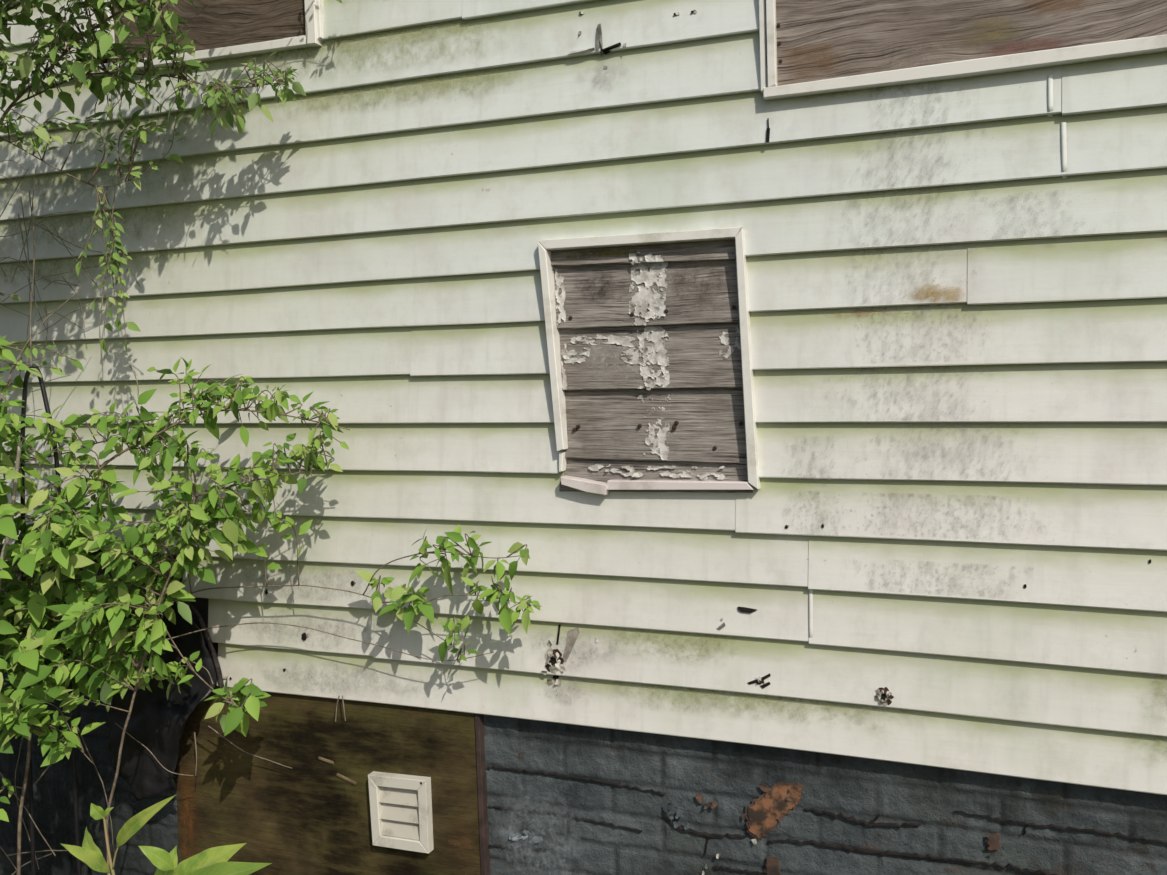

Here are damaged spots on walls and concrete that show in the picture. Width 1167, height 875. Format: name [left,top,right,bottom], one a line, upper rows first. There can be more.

peeling [553,268,566,325]
peeling [561,252,726,480]
peeling [719,327,741,359]
spalling [742,781,804,844]